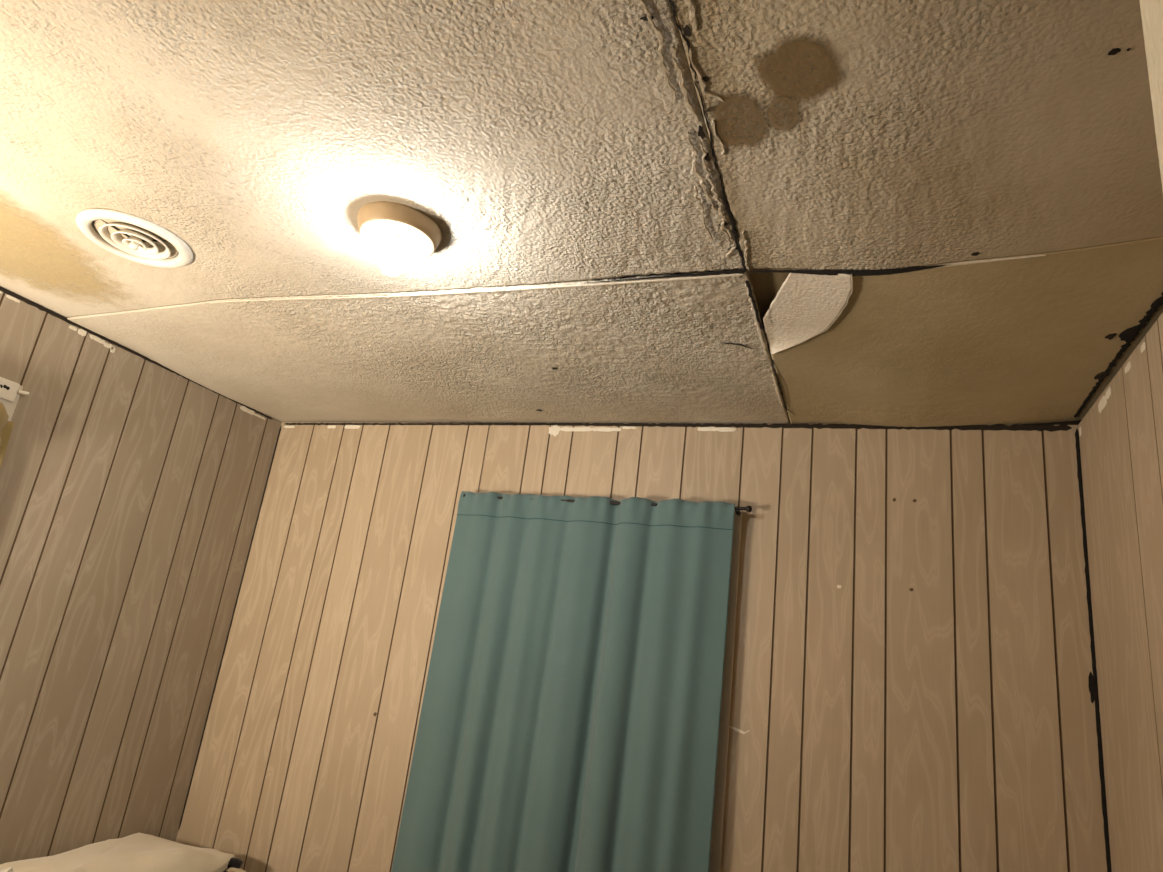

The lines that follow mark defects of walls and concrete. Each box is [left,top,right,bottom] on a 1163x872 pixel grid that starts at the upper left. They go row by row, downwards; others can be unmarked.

damp [712,38,840,147]
peeling [763,269,853,355]